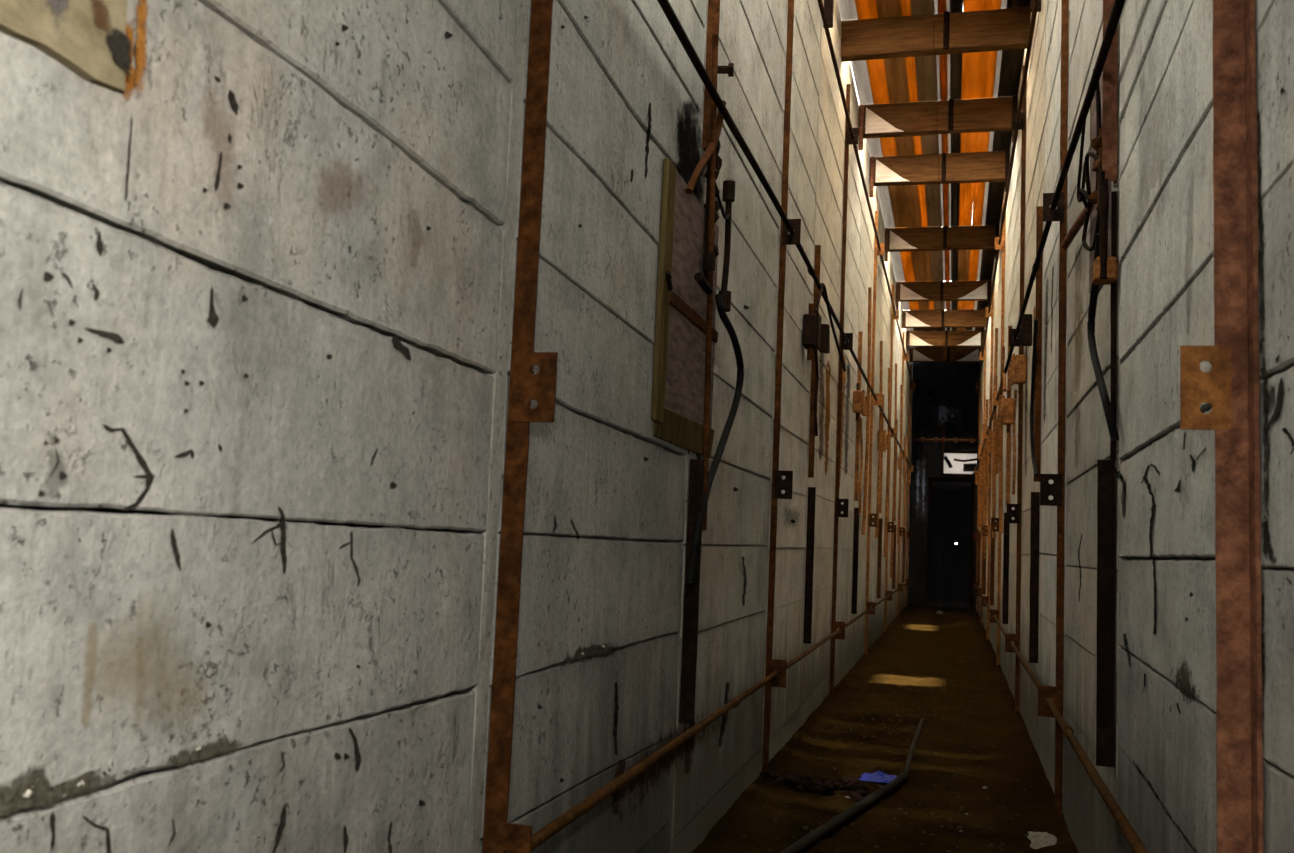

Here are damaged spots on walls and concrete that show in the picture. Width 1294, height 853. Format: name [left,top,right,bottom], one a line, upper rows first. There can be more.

crack [1263,378,1294,455]
crack [103,424,154,511]
crack [171,529,181,571]
crack [1141,432,1206,634]
spalling [157,739,241,768]
spalling [0,768,136,853]